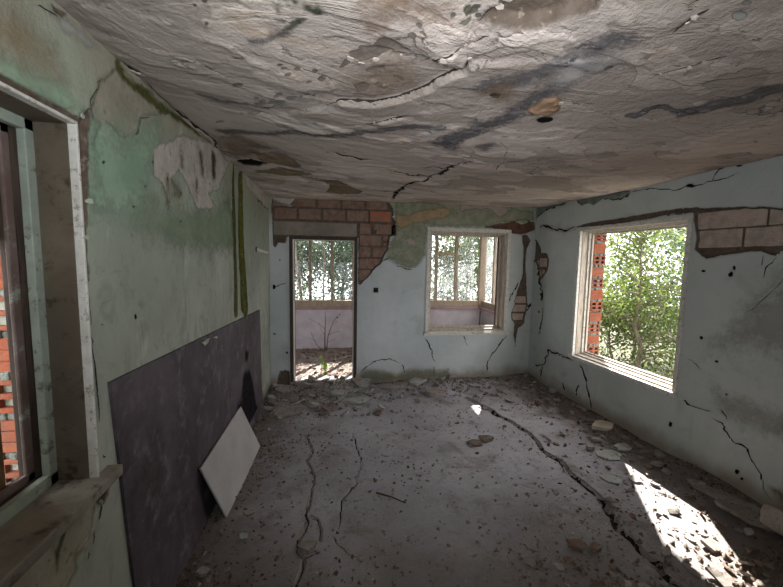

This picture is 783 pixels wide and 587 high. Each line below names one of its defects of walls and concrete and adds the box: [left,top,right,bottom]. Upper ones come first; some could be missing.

water stain [217,32,636,150]
water stain [88,119,248,317]
flaking render [153,134,396,285]
crack [335,152,475,199]
flaking render [486,202,566,347]
crack [509,268,591,405]
peeling [577,191,630,205]
flaking render [577,206,783,259]
crack [293,435,362,587]
crack [450,393,688,587]
crack [684,400,768,496]